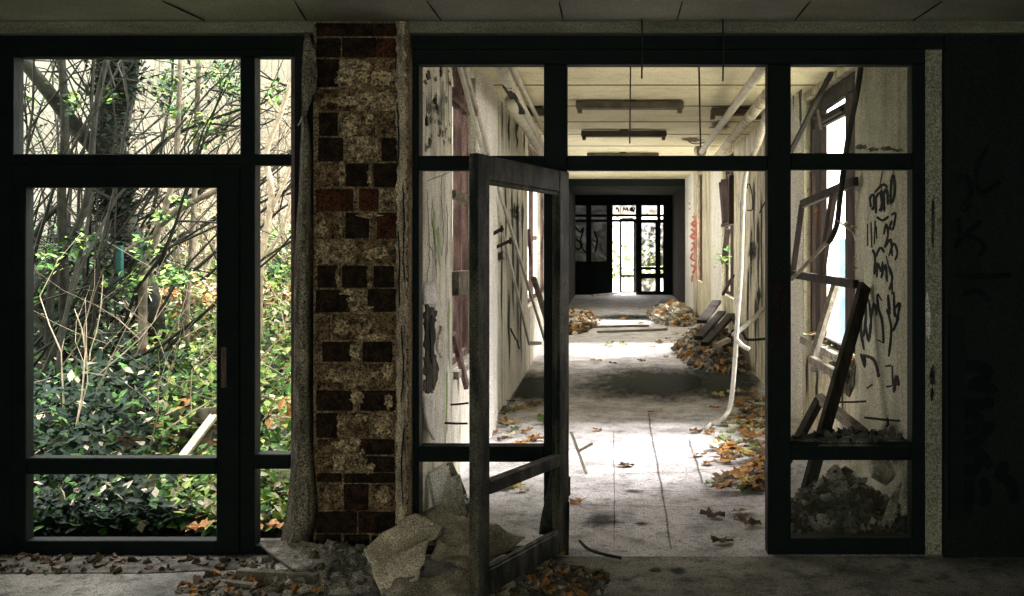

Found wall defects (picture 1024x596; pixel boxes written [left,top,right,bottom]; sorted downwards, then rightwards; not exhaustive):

peeling [423,67,451,151]
peeling [316,21,408,524]
flaking render [422,281,446,440]
crack [648,413,672,549]